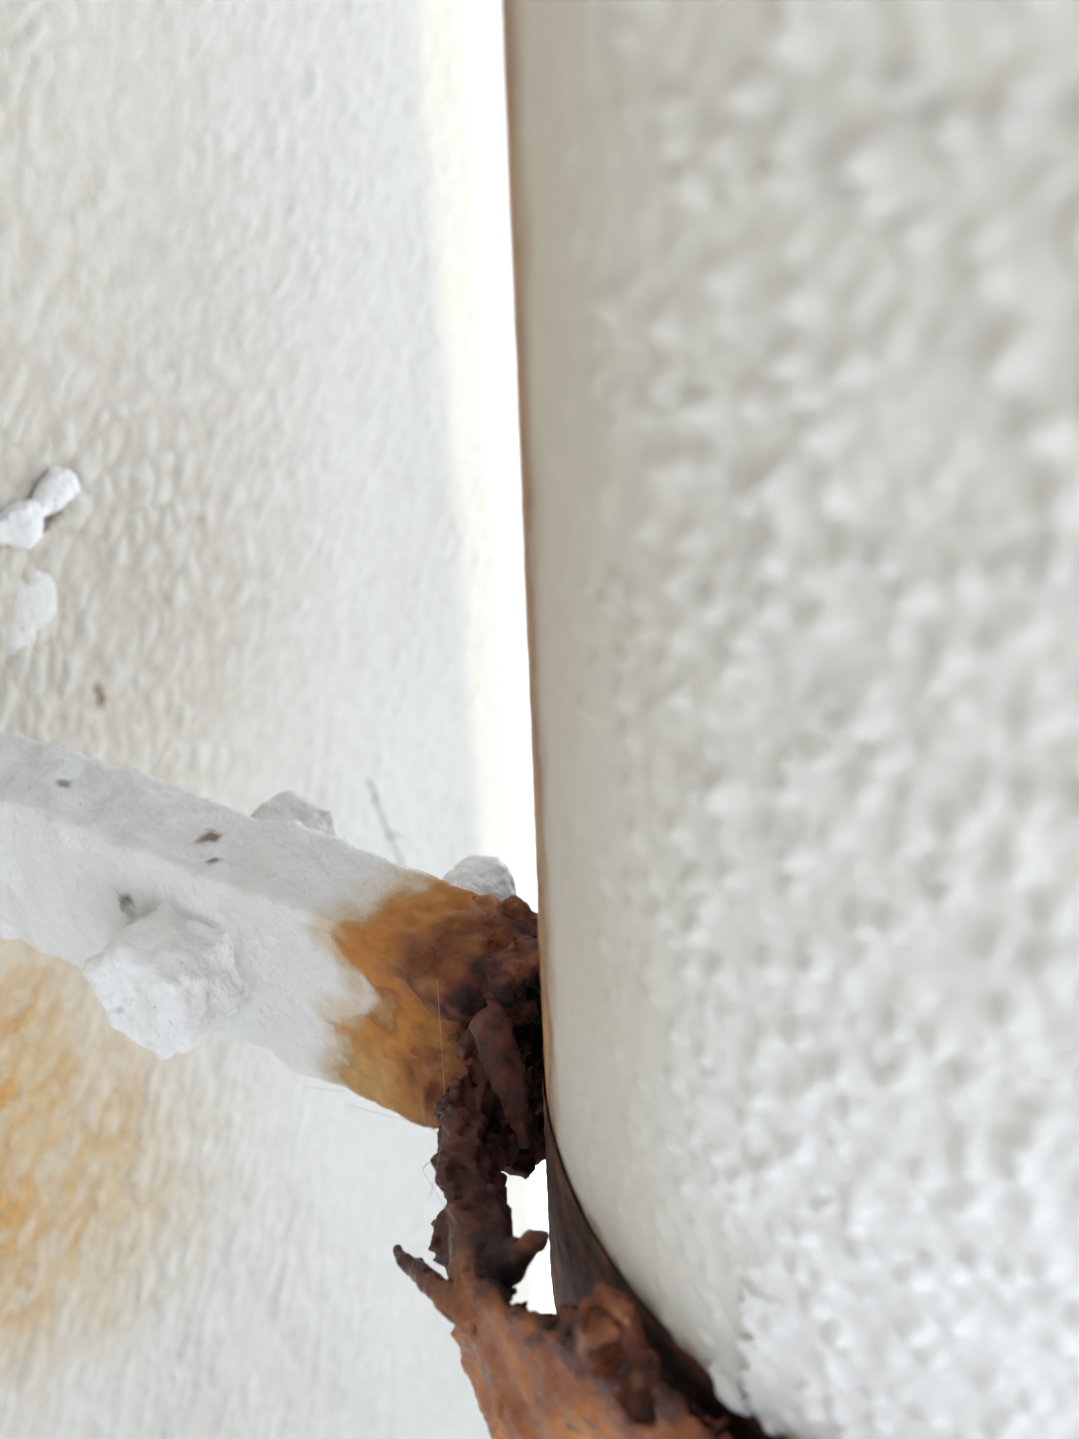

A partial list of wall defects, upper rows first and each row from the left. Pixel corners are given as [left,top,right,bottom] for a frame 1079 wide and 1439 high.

peeling [42,509,63,533]
rust [330,876,511,1128]